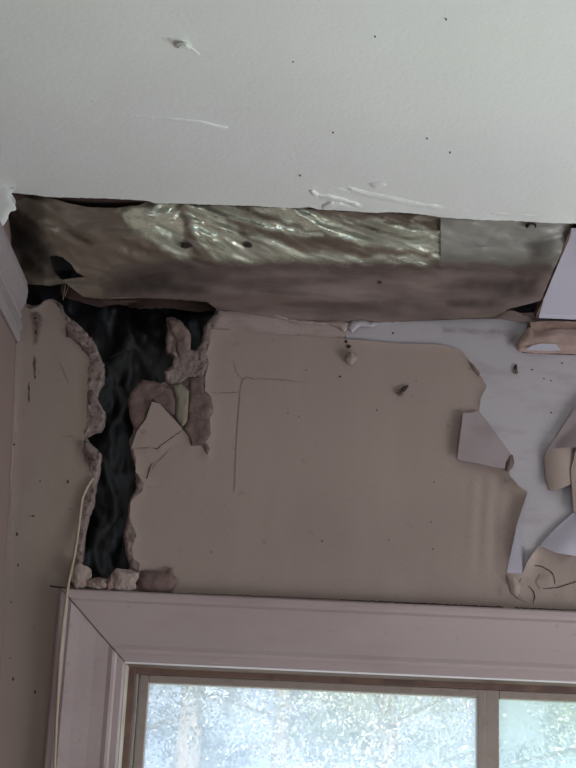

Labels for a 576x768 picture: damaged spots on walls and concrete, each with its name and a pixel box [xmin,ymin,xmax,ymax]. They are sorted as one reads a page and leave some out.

spalling [57,302,105,564]
spalling [124,311,222,572]
peeling [327,319,576,574]